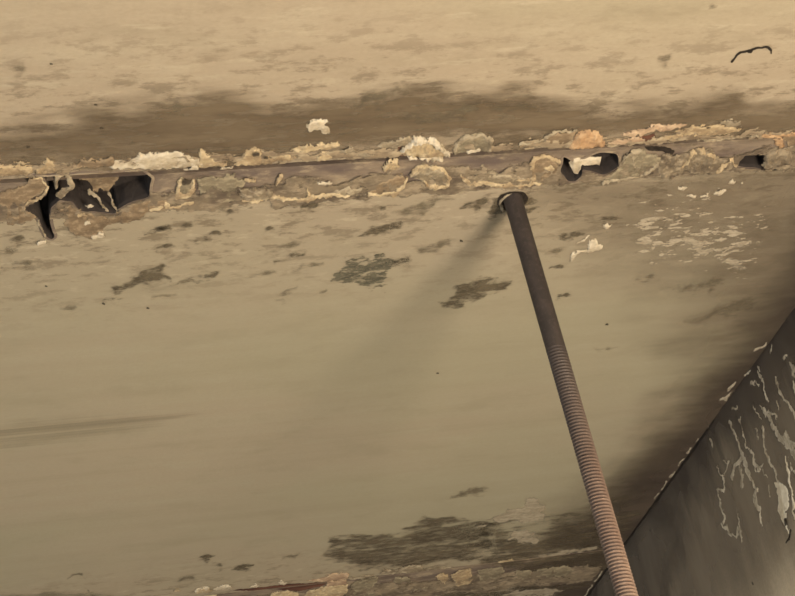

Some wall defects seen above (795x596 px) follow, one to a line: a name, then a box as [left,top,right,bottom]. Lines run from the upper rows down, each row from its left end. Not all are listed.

peeling [306,118,330,134]
hole [559,150,621,183]
hole [738,152,765,171]
hole [24,170,154,241]
water stain [0,117,795,279]
water stain [113,264,171,293]
water stain [331,253,409,287]
water stain [443,279,511,308]
water stain [611,281,795,596]
water stain [270,498,616,596]
water stain [194,584,233,596]